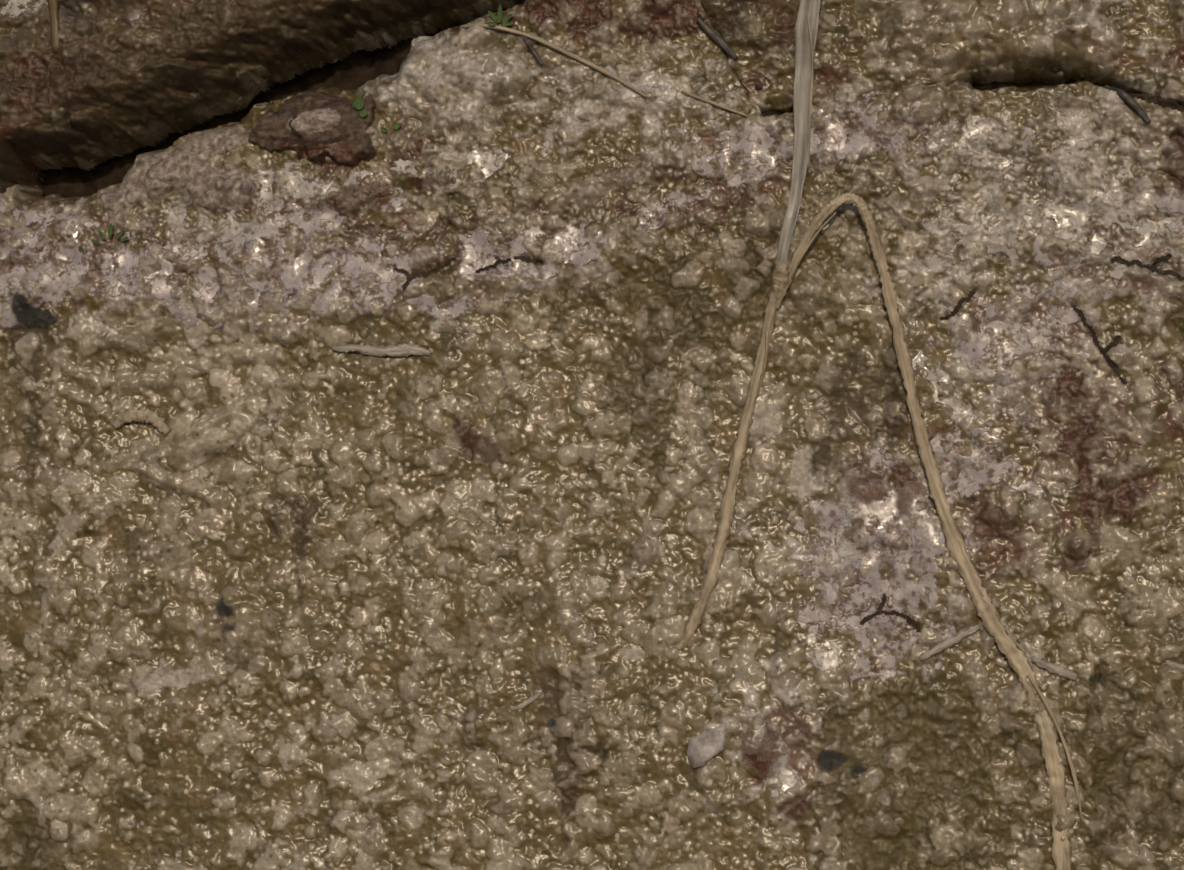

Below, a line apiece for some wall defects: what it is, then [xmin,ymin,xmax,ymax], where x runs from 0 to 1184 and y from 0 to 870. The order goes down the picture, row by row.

crack [972,81,1071,90]
crack [37,4,522,199]
crack [1106,88,1184,112]